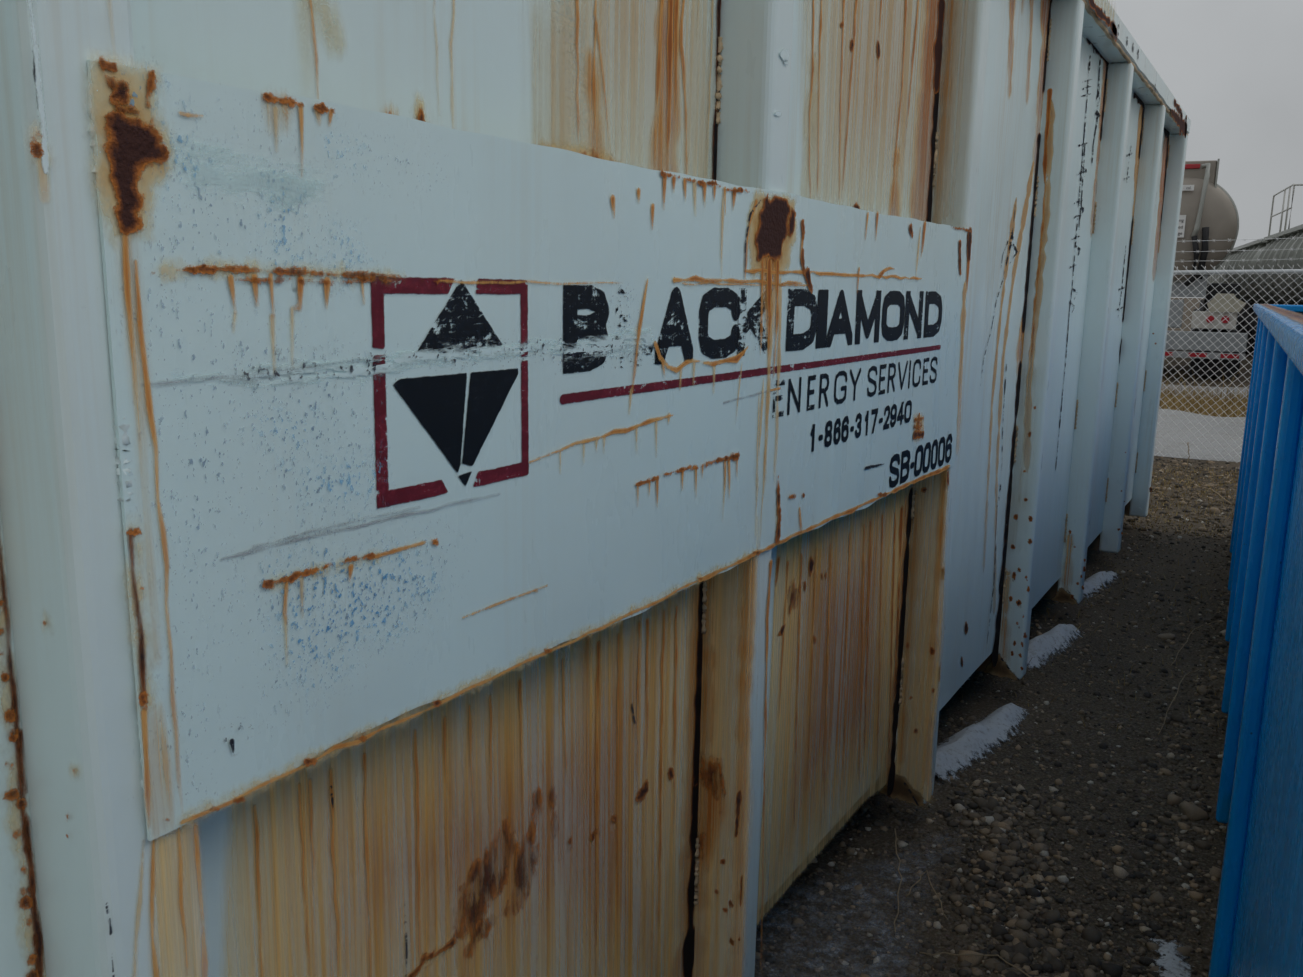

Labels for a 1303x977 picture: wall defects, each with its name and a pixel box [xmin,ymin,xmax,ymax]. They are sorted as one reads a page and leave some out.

rust [92,57,177,814]
rust [166,0,950,977]
rust [984,568,1030,680]
rust [990,0,1055,433]